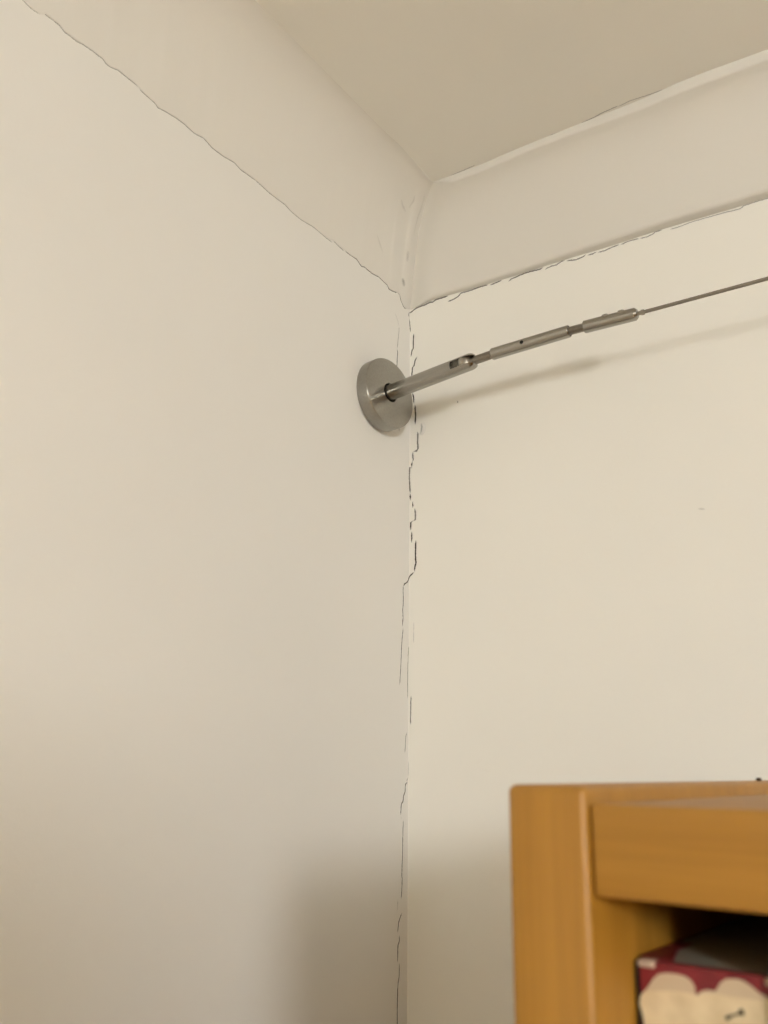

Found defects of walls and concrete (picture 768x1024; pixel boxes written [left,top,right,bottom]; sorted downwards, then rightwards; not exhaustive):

crack [22,0,768,376]
crack [396,393,419,1024]